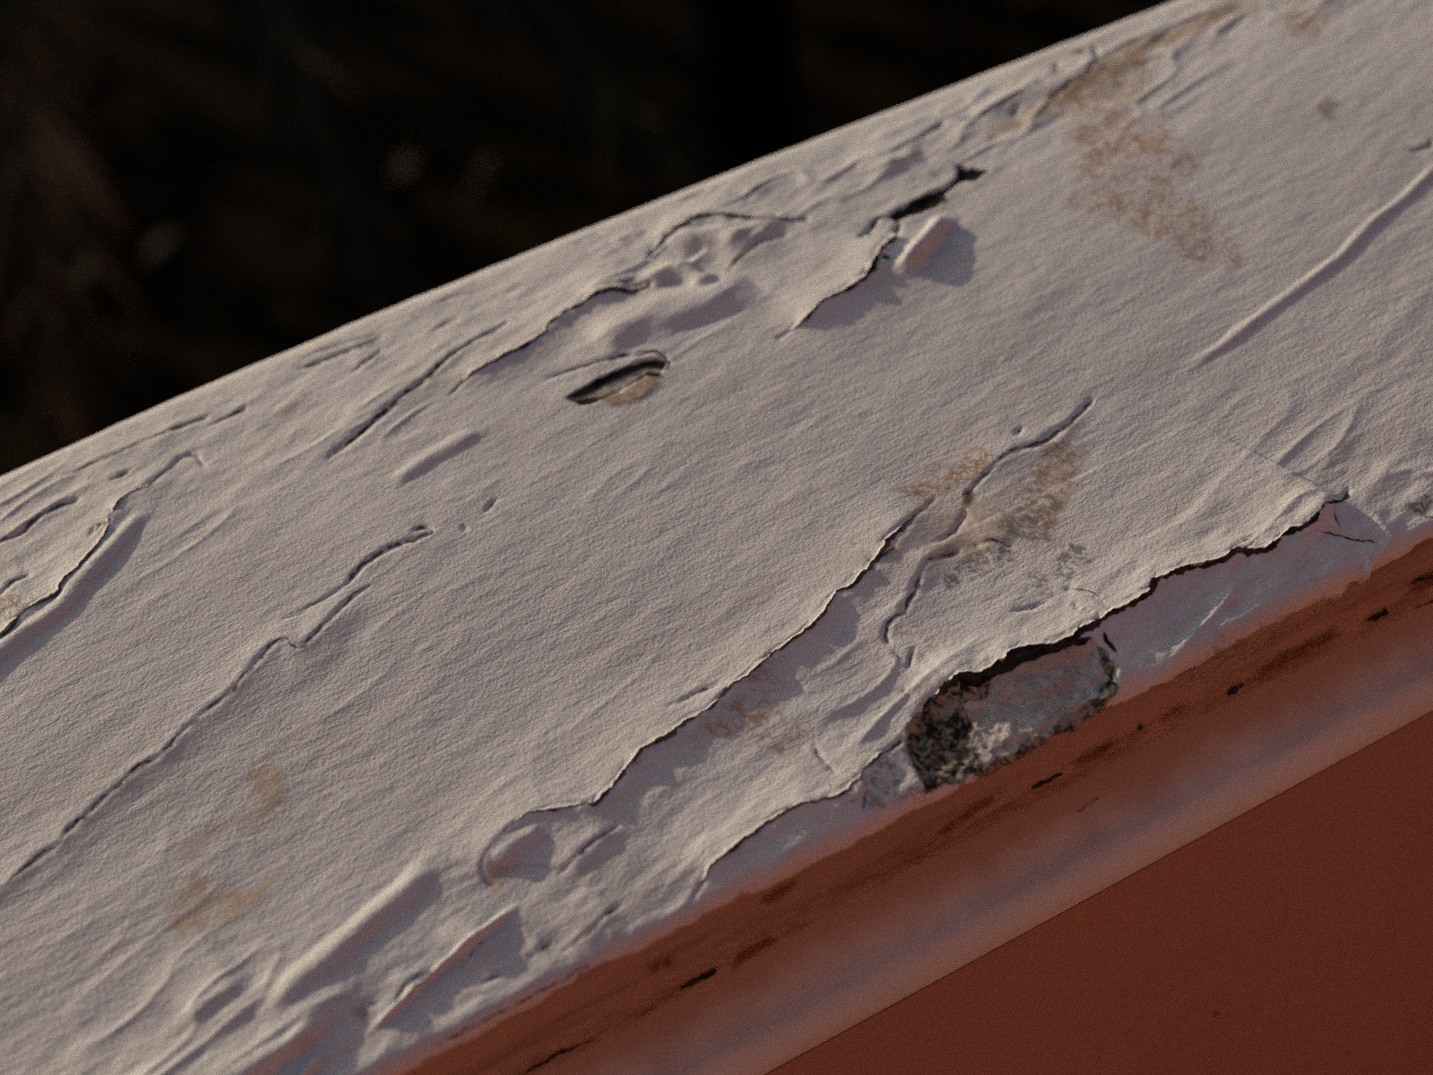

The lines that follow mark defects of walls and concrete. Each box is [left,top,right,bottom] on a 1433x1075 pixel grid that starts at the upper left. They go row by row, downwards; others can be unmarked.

crack [295,173,805,450]
peeling [566,358,668,405]
crack [788,216,901,332]
crack [0,410,244,636]
crack [0,526,433,890]
crack [505,402,1092,887]
spalling [905,637,1119,794]
crack [923,492,1375,712]